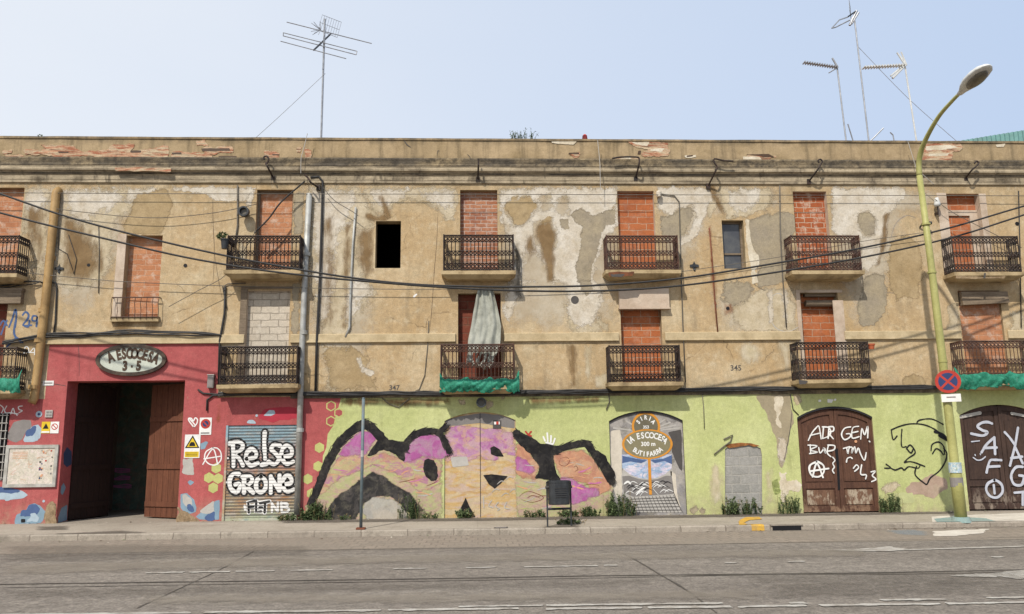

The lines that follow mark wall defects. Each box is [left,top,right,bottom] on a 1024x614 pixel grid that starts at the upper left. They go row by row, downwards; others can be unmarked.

flaking render [2,139,255,291]
flaking render [291,184,458,392]
damp [503,196,571,326]
flaking render [498,185,634,333]
damp [592,233,616,315]
flaking render [616,141,670,159]
peeling [656,185,798,332]
flaking render [830,186,926,327]
flaking render [922,143,963,160]
flaking render [756,380,807,506]